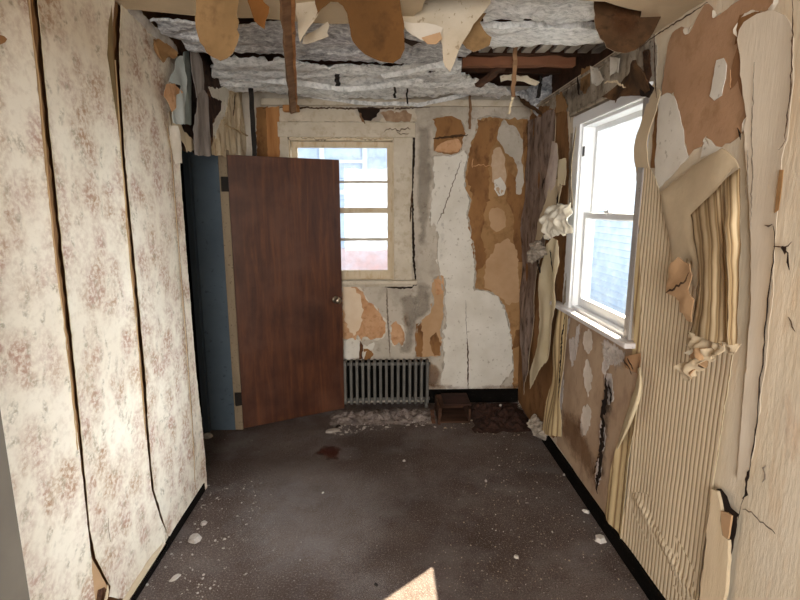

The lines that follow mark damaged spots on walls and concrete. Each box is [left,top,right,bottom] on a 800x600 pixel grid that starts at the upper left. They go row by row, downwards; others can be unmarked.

peeling [542,0,779,188]
flaking render [342,115,529,389]
peeling [557,316,637,513]
crack [737,73,791,533]